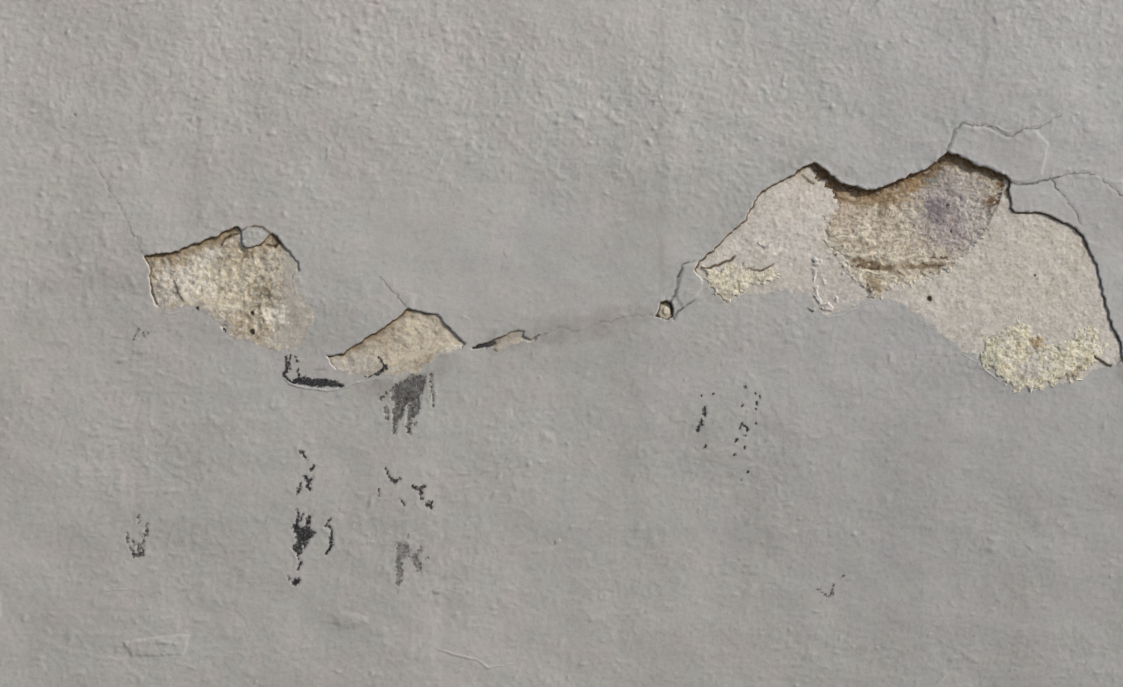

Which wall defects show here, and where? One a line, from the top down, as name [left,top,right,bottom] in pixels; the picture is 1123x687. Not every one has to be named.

spalling [144,225,539,434]
spalling [694,152,1122,394]